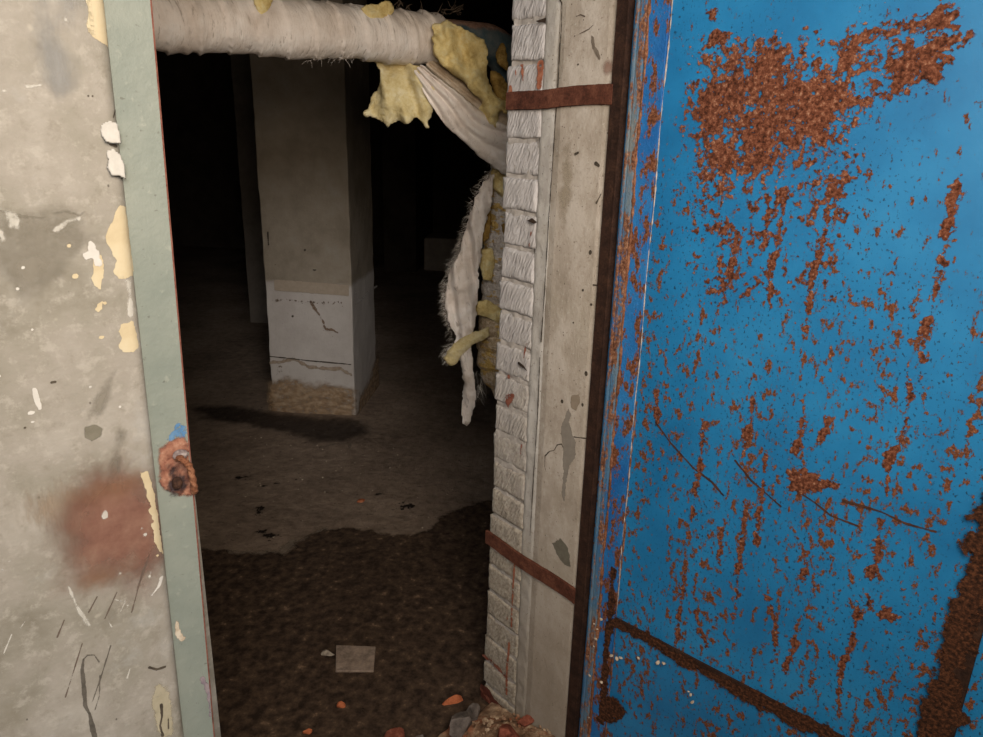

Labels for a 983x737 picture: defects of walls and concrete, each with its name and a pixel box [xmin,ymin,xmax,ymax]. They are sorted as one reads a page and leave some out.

peeling [86,0,108,47]
peeling [100,121,126,179]
corrosion [673,0,975,334]
peeling [83,205,139,352]
crack [269,356,351,365]
crack [310,301,338,333]
corrosion [587,0,845,737]
corrosion [917,174,964,364]
corrosion [41,474,162,579]
peeling [141,471,163,557]
corrosion [864,379,918,581]
corrosion [904,492,983,737]